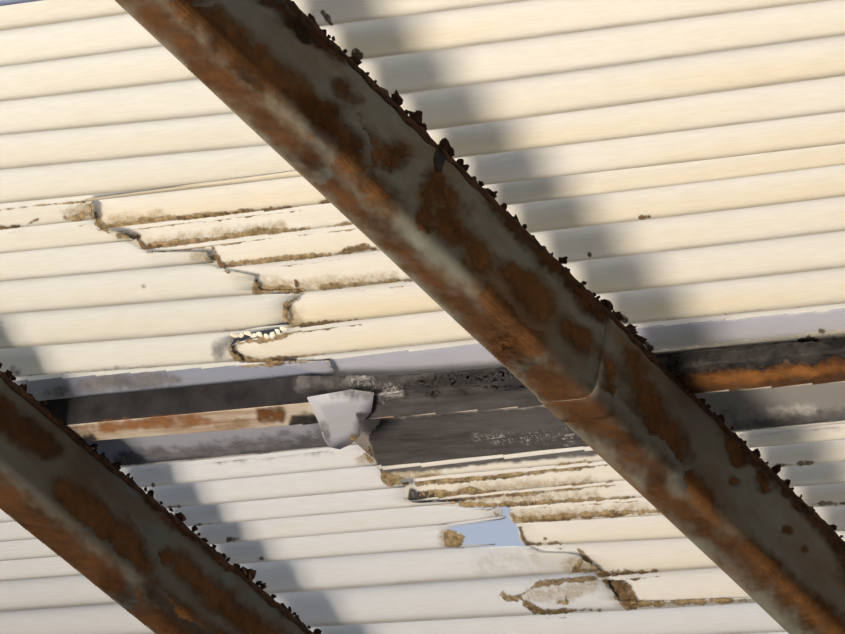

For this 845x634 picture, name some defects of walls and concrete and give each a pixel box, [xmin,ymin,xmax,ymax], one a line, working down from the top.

corrosion [0,362,322,634]
corrosion [123,0,556,363]
spalling [440,529,465,547]
corrosion [257,0,845,634]